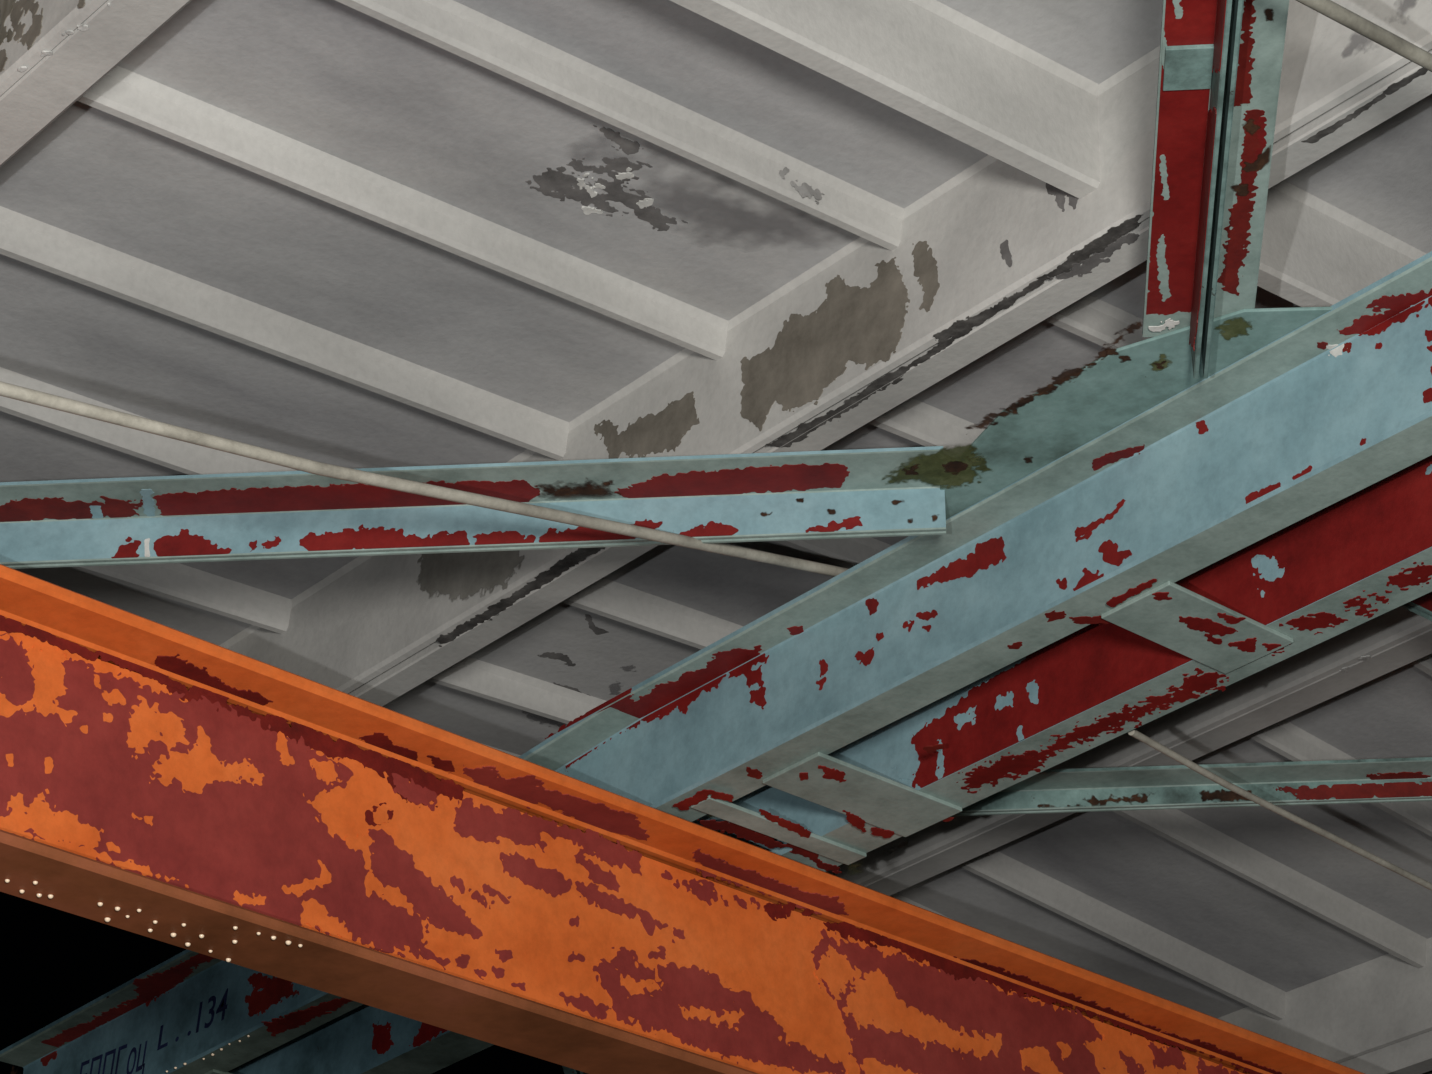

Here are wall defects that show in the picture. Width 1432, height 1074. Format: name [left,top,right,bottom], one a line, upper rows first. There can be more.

peeling [525,125,688,231]
peeling [1146,0,1273,351]
peeling [740,241,940,432]
peeling [1317,288,1432,403]
peeling [0,463,850,558]
peeling [594,391,700,459]
peeling [805,509,863,533]
rust [942,461,968,475]
peeling [1092,445,1145,471]
peeling [889,455,1432,794]
peeling [1275,772,1432,800]
peeling [0,615,1282,1074]